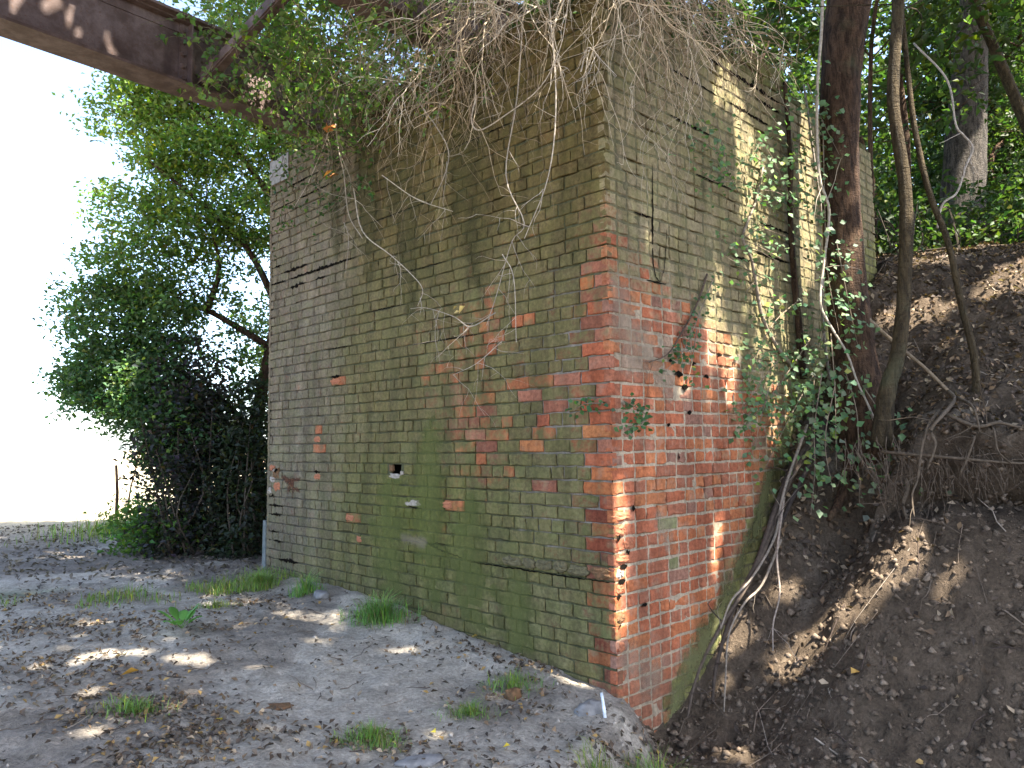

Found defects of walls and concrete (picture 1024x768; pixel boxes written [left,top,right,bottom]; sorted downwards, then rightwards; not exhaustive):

crack [635,165,667,285]
crack [271,258,352,289]
spalling [389,464,404,479]